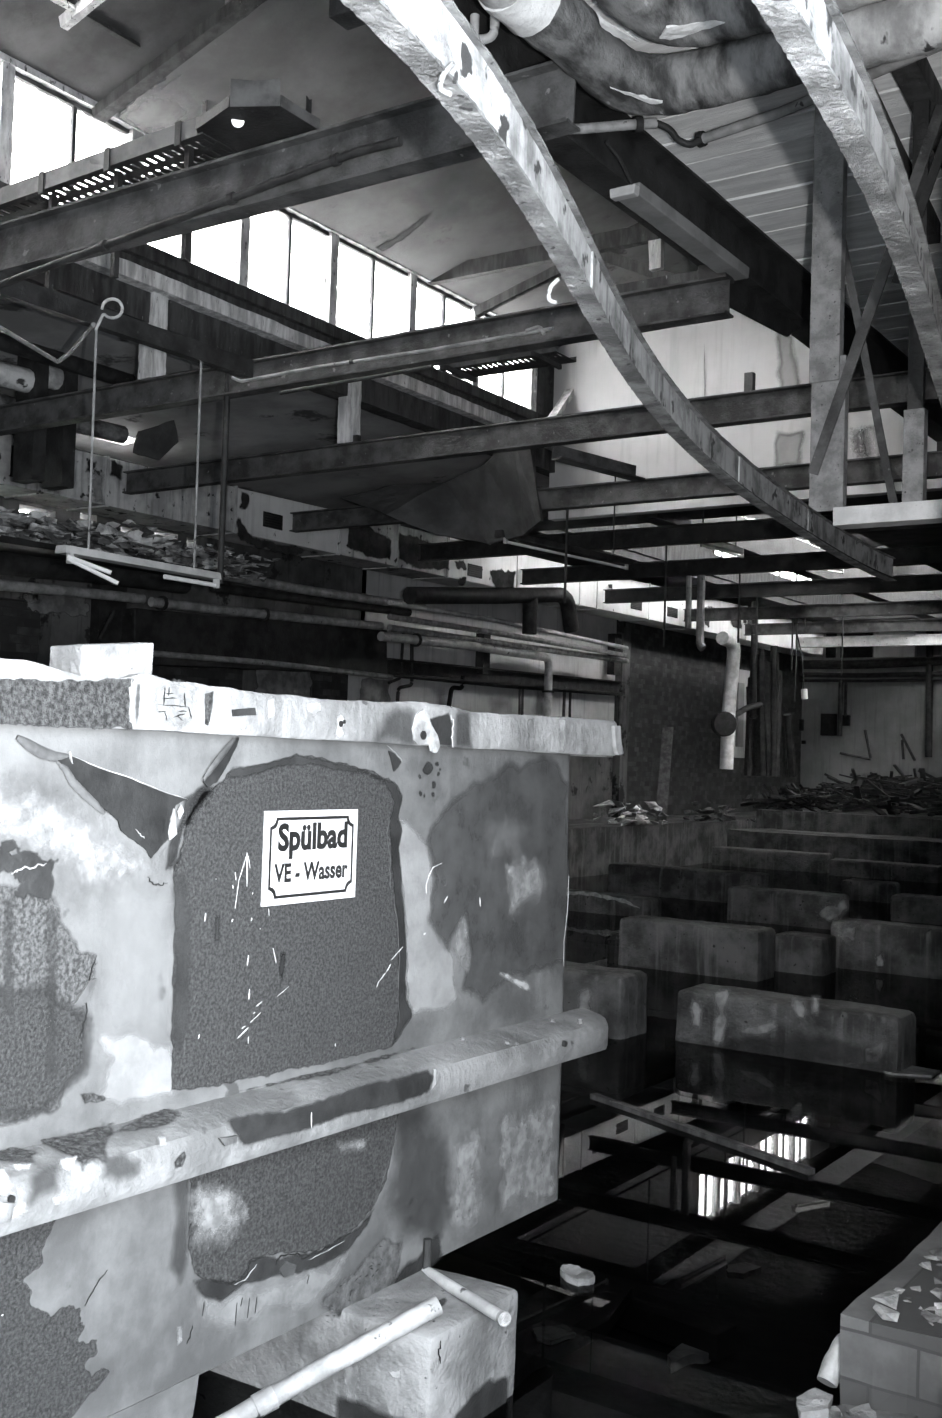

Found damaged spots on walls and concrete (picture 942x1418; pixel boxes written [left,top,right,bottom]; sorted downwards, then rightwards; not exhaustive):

peeling [0,886,97,1126]
peeling [171,746,412,1090]
damp [428,696,639,1000]
peeling [0,1165,109,1418]
peeling [61,1158,75,1170]
peeling [188,1114,398,1301]